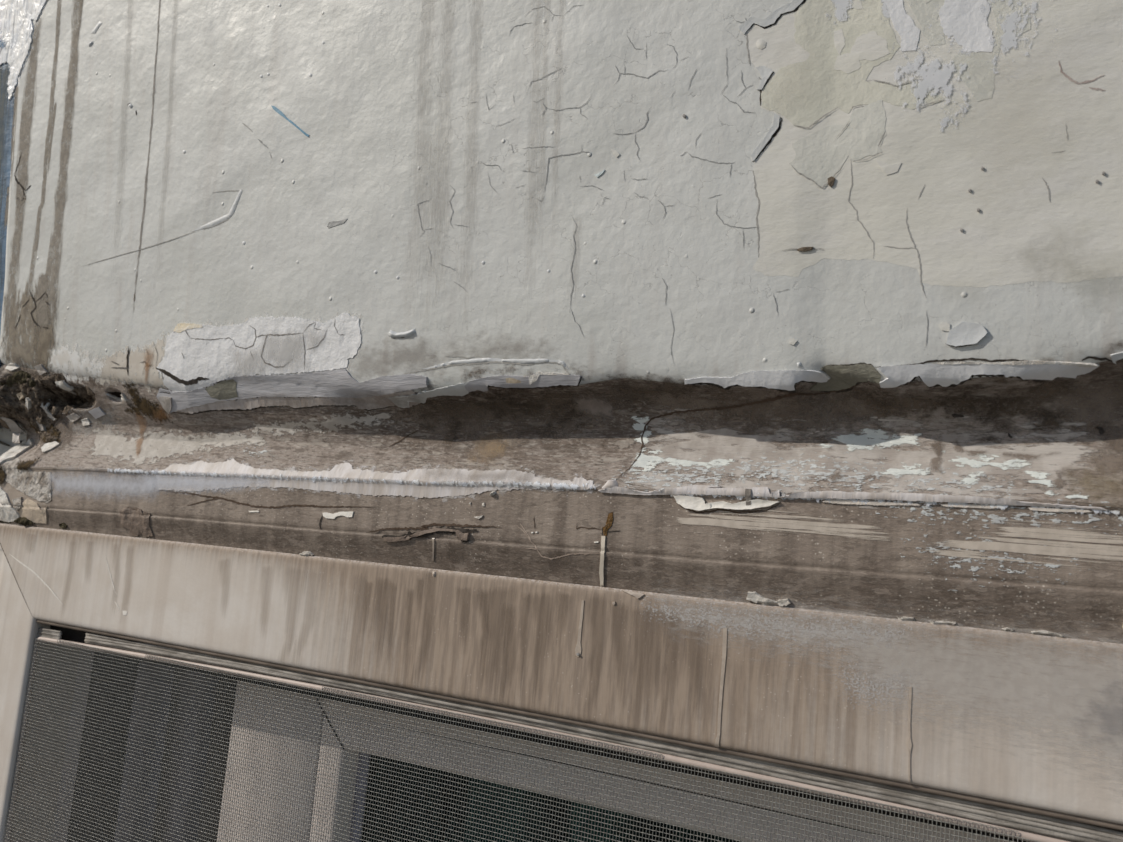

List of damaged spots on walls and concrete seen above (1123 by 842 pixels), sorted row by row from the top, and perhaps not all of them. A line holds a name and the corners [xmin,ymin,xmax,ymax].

water stain [0,0,83,375]
crack [471,36,697,218]
crack [680,135,754,247]
crack [720,49,762,113]
peeling [738,0,1123,288]
crack [569,215,584,337]
peeling [0,313,1123,524]
water stain [390,367,1123,473]
peeling [319,511,354,529]